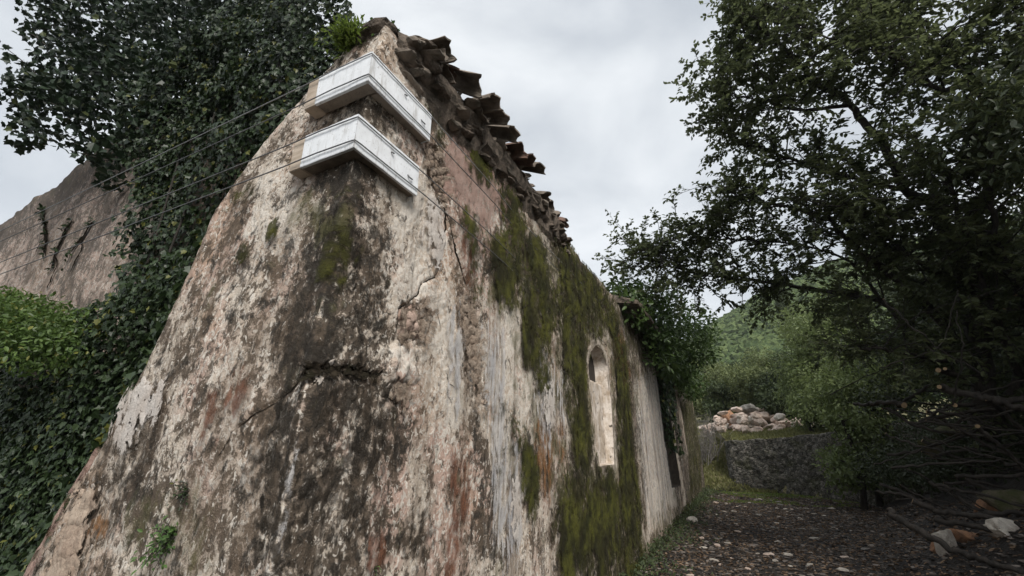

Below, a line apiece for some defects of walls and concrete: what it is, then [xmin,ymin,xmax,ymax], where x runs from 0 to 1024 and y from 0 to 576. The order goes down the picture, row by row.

crack [396,203,466,328]
crack [217,362,396,457]
leakage [241,171,392,576]
leakage [480,320,565,576]
leakage [399,509,435,571]